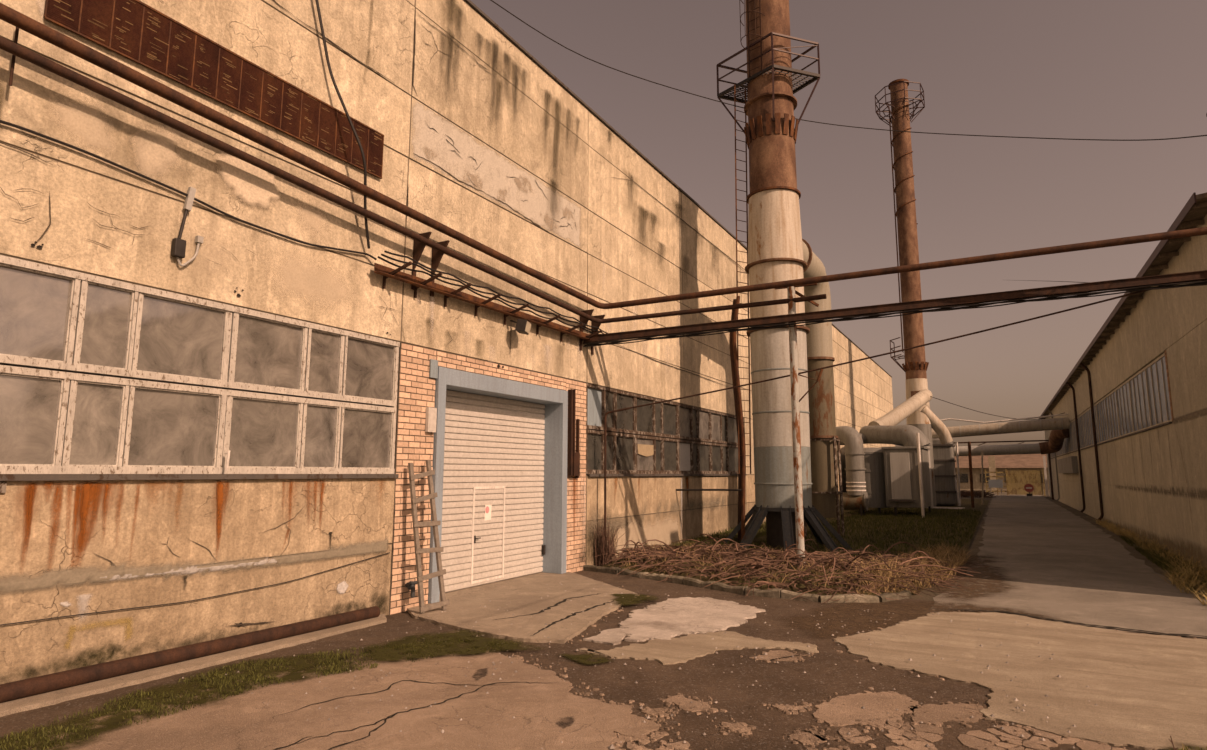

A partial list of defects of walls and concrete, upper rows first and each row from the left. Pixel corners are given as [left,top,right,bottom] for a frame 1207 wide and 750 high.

damp [493,44,525,91]
peeling [412,102,580,246]
rust [24,482,123,557]
rust [217,482,228,544]
crack [273,680,539,750]